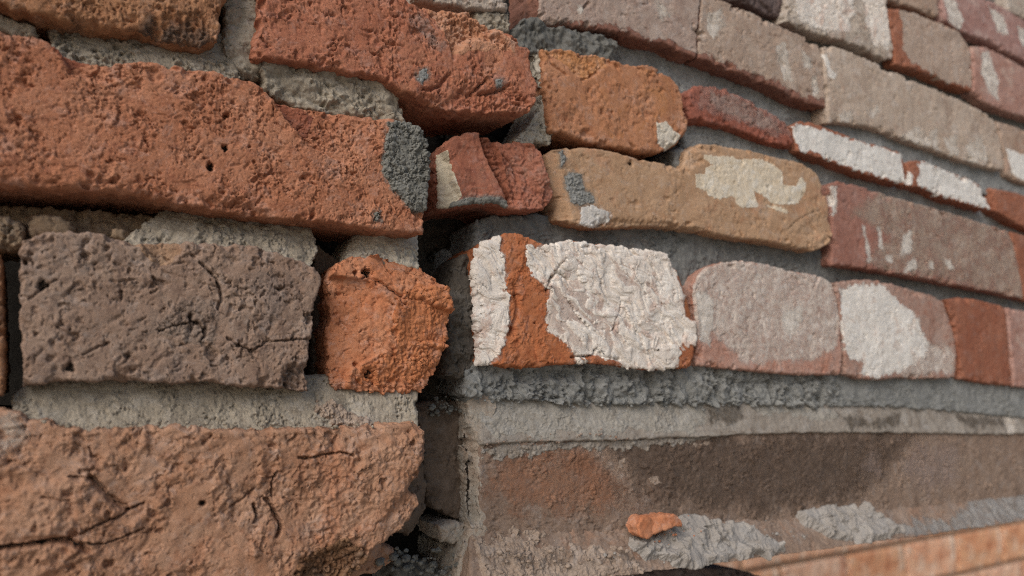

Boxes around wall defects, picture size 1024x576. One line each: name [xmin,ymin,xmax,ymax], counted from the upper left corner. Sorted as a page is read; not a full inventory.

peeling [792,123,990,210]
crack [160,265,223,338]
peeling [468,233,698,372]
peeling [839,281,929,380]
crack [0,476,144,548]
crack [252,473,280,530]